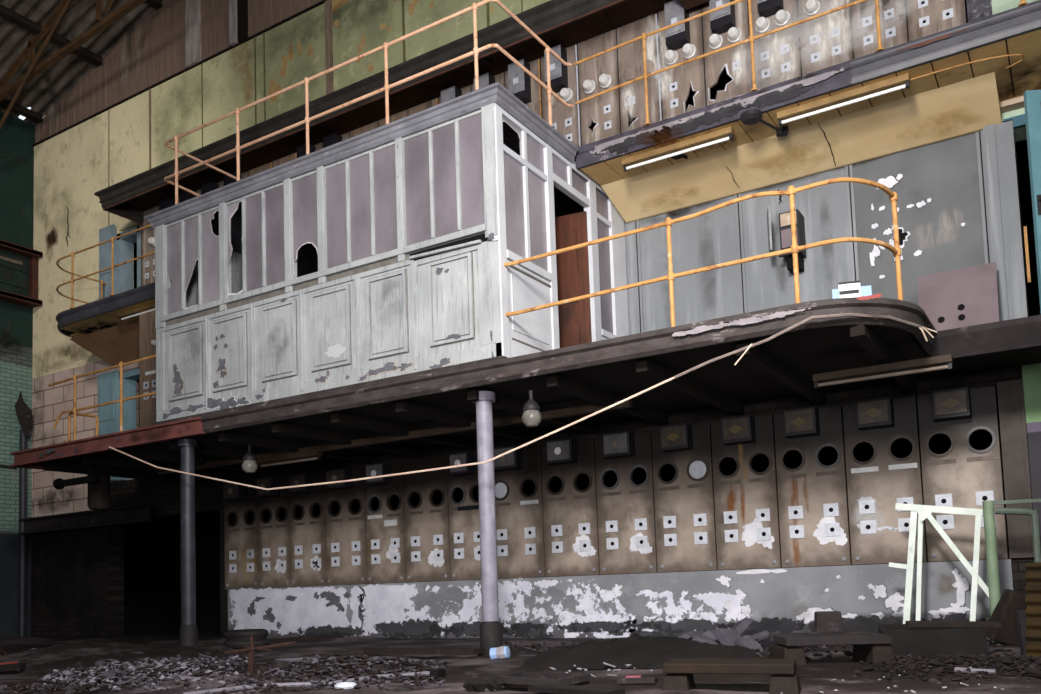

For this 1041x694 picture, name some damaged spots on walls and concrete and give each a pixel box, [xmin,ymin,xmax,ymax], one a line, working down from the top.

peeling [588,68,844,154]
peeling [877,174,903,190]
peeling [869,198,932,279]
peeling [162,334,266,420]
peeling [315,344,347,384]
peeling [229,582,482,639]
peeling [498,568,986,638]